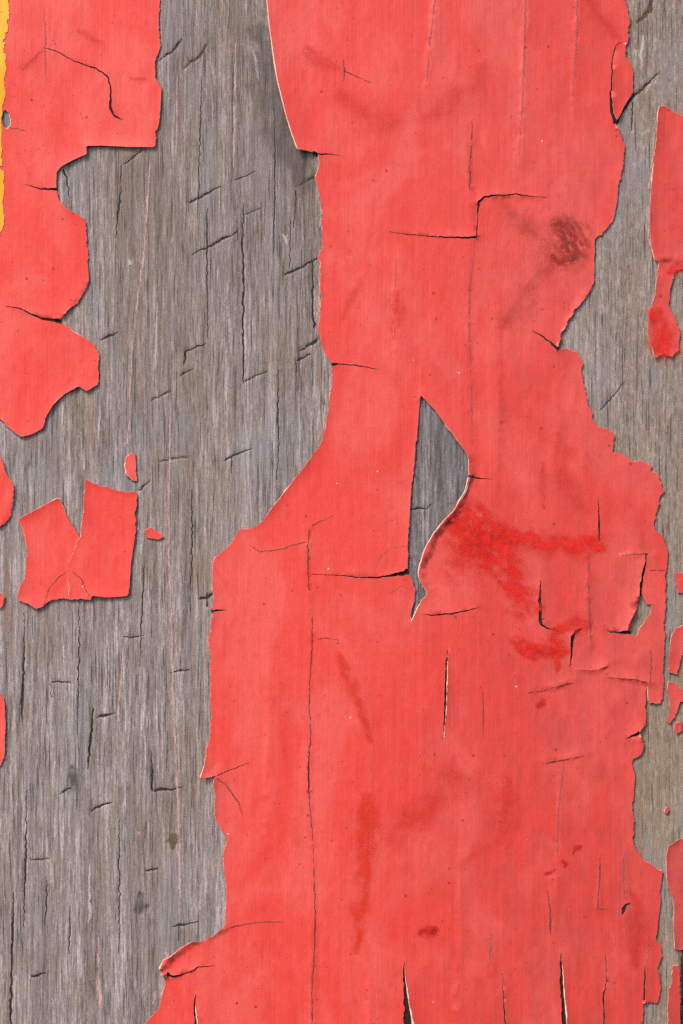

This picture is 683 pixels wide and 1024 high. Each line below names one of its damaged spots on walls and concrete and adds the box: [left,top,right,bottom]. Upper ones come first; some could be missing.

crack [23,9,122,120]
peeling [0,0,162,437]
crack [391,125,545,444]
crack [20,572,115,794]
peeling [0,453,164,609]
crack [251,515,409,1024]
peeling [146,0,683,1024]
crack [441,650,449,740]
crack [529,500,652,693]
crack [167,966,210,1024]
crack [403,961,414,1024]